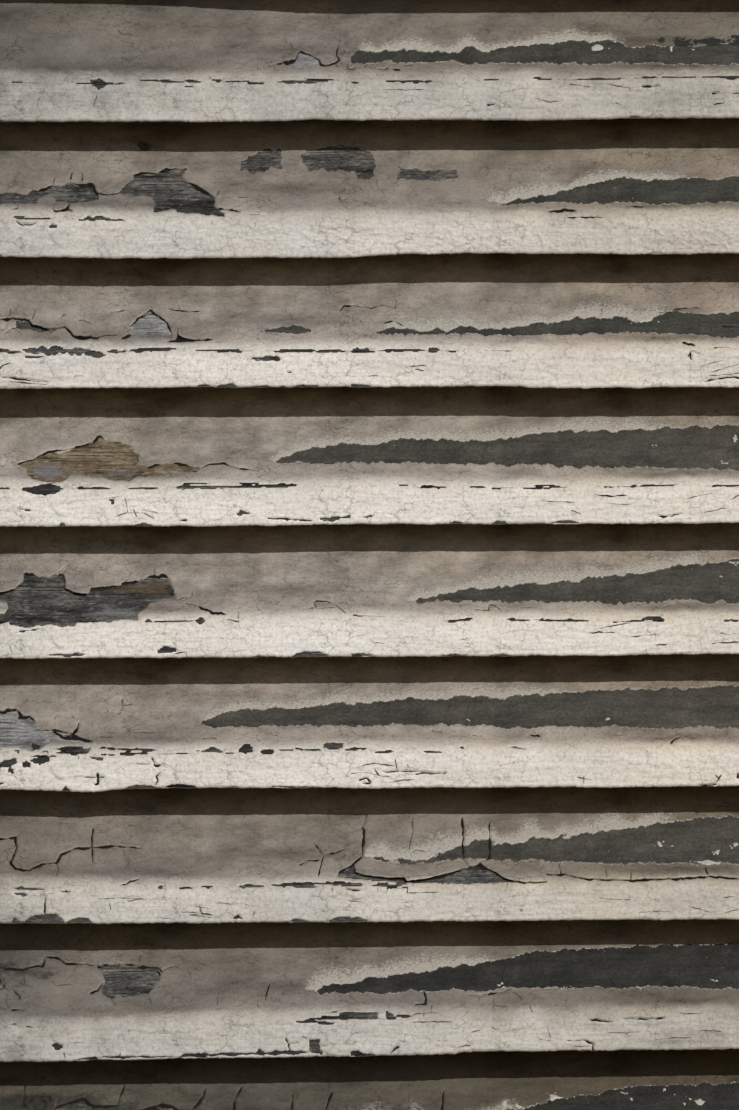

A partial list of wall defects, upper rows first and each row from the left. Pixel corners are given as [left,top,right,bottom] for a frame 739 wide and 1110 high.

crack [0,309,124,340]
crack [169,308,212,343]
peeling [196,300,739,371]
peeling [270,415,739,487]
peeling [0,560,205,633]
peeling [404,550,739,623]
peeling [176,679,739,754]
crack [0,828,141,872]
crack [300,843,345,876]
crack [122,878,255,919]
crack [0,957,99,1011]
peeling [52,943,739,1060]